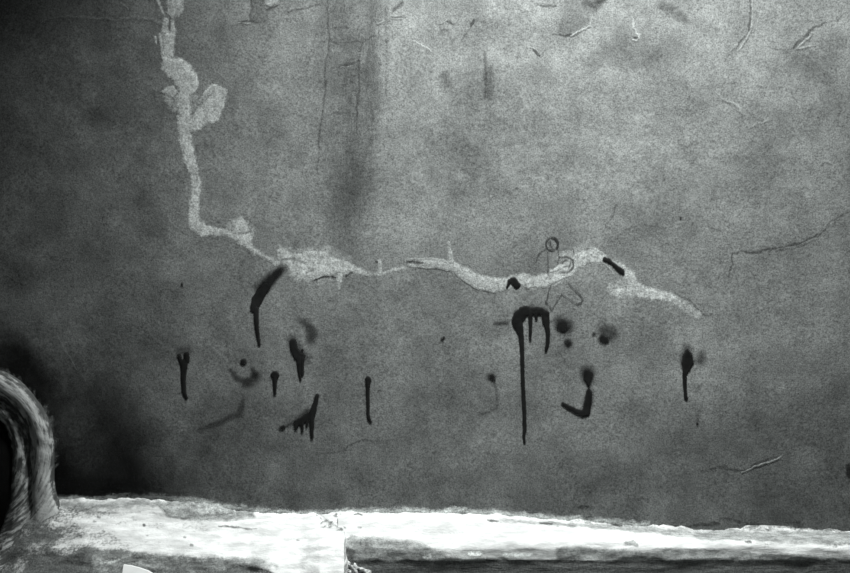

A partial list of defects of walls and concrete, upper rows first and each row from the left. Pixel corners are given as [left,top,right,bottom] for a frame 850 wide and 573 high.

crack [154,0,701,317]